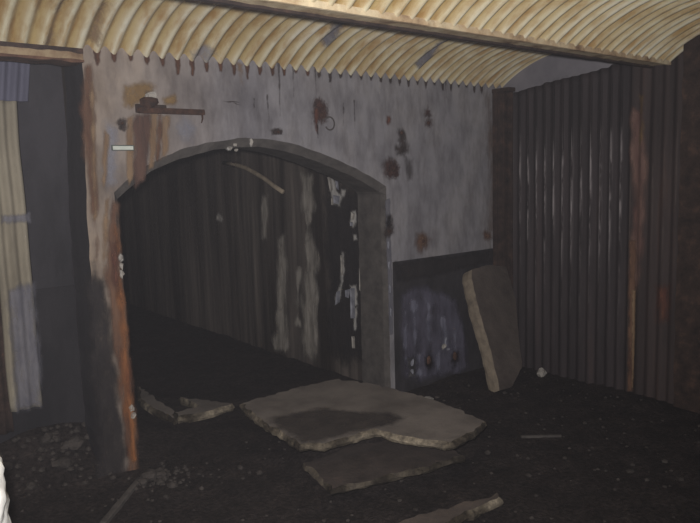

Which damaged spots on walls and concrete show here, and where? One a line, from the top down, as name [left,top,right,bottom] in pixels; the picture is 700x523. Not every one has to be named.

corrosion [118,114,170,187]
corrosion [314,99,328,134]
corrosion [384,130,412,178]
peeling [327,177,346,205]
corrosion [80,3,137,471]
corrosion [627,109,647,391]
peeling [335,253,360,348]